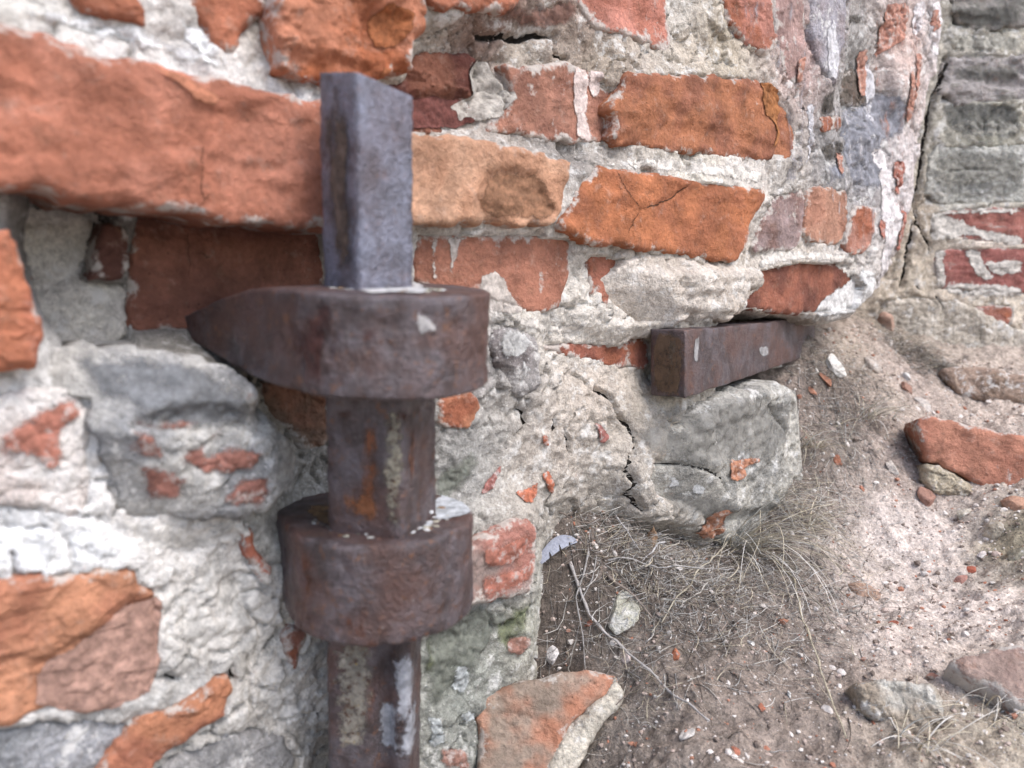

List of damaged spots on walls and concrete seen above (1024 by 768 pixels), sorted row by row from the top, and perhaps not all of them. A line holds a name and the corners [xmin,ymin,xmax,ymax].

crack [473,32,567,61]
corrosion [325,90,349,267]
crack [615,170,690,233]
crack [594,391,723,511]